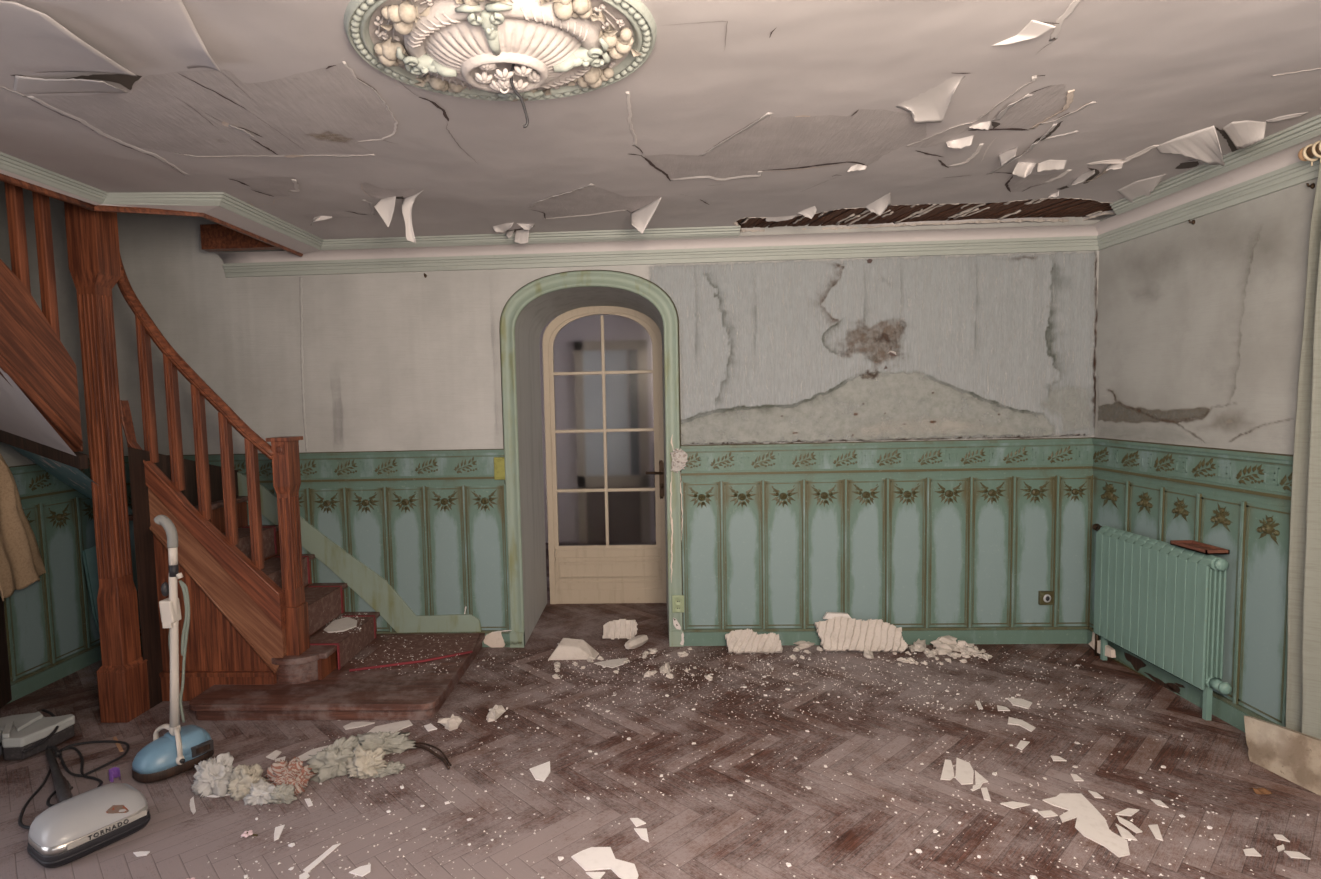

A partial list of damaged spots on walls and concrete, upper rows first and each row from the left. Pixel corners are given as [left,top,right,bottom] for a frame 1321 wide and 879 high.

peeling [0,0,399,175]
peeling [360,182,423,243]
crack [400,82,478,164]
peeling [492,184,662,244]
peeling [625,73,1308,232]
water stain [650,252,1210,445]